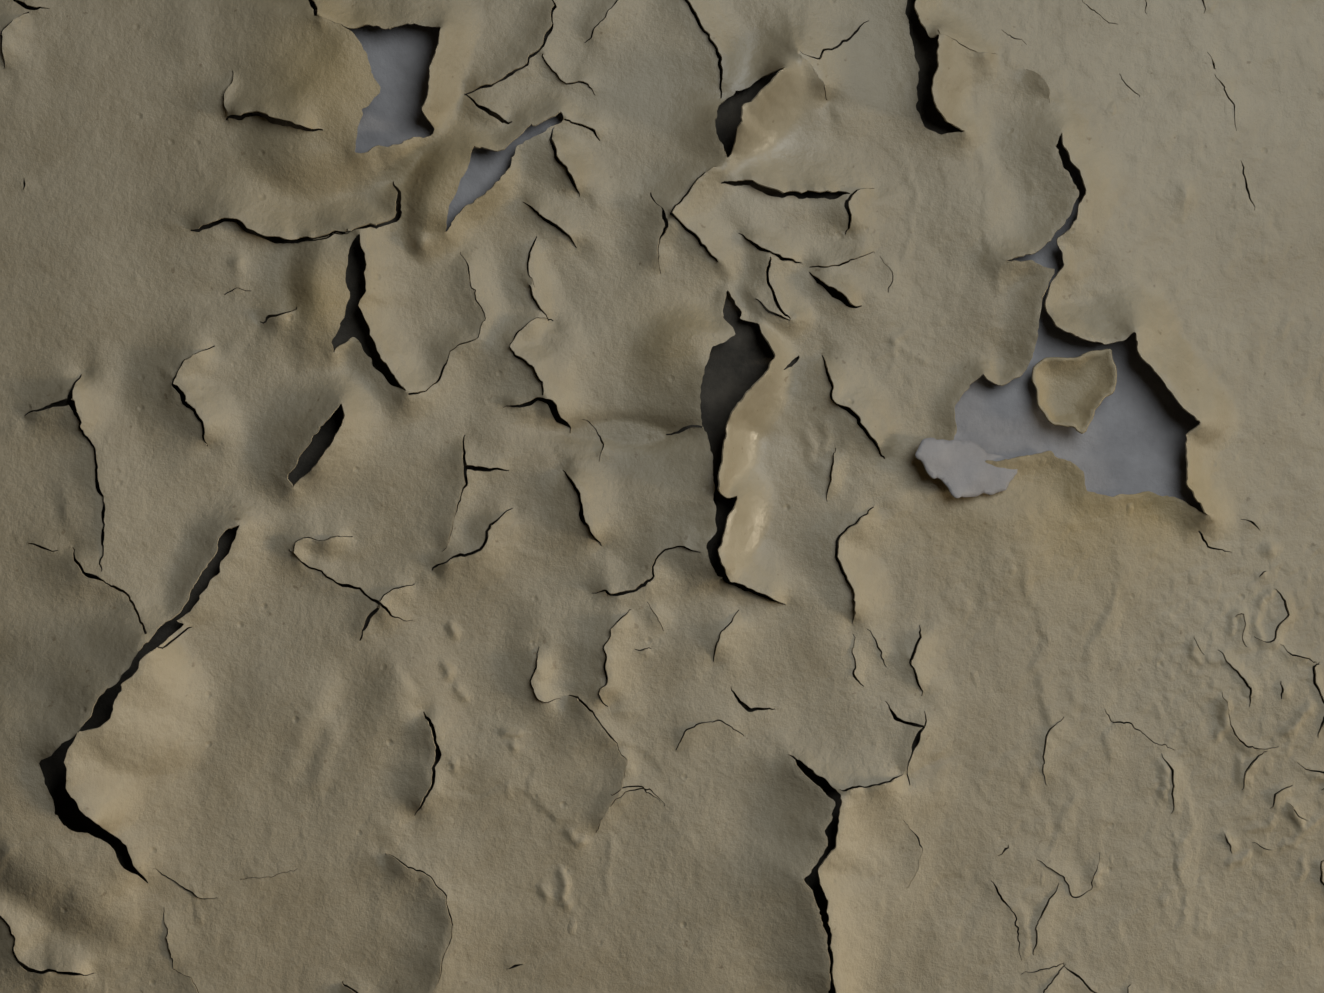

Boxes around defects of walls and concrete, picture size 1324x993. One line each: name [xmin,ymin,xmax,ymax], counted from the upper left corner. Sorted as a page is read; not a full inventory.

peeling [0,0,857,993]
peeling [905,0,1254,513]